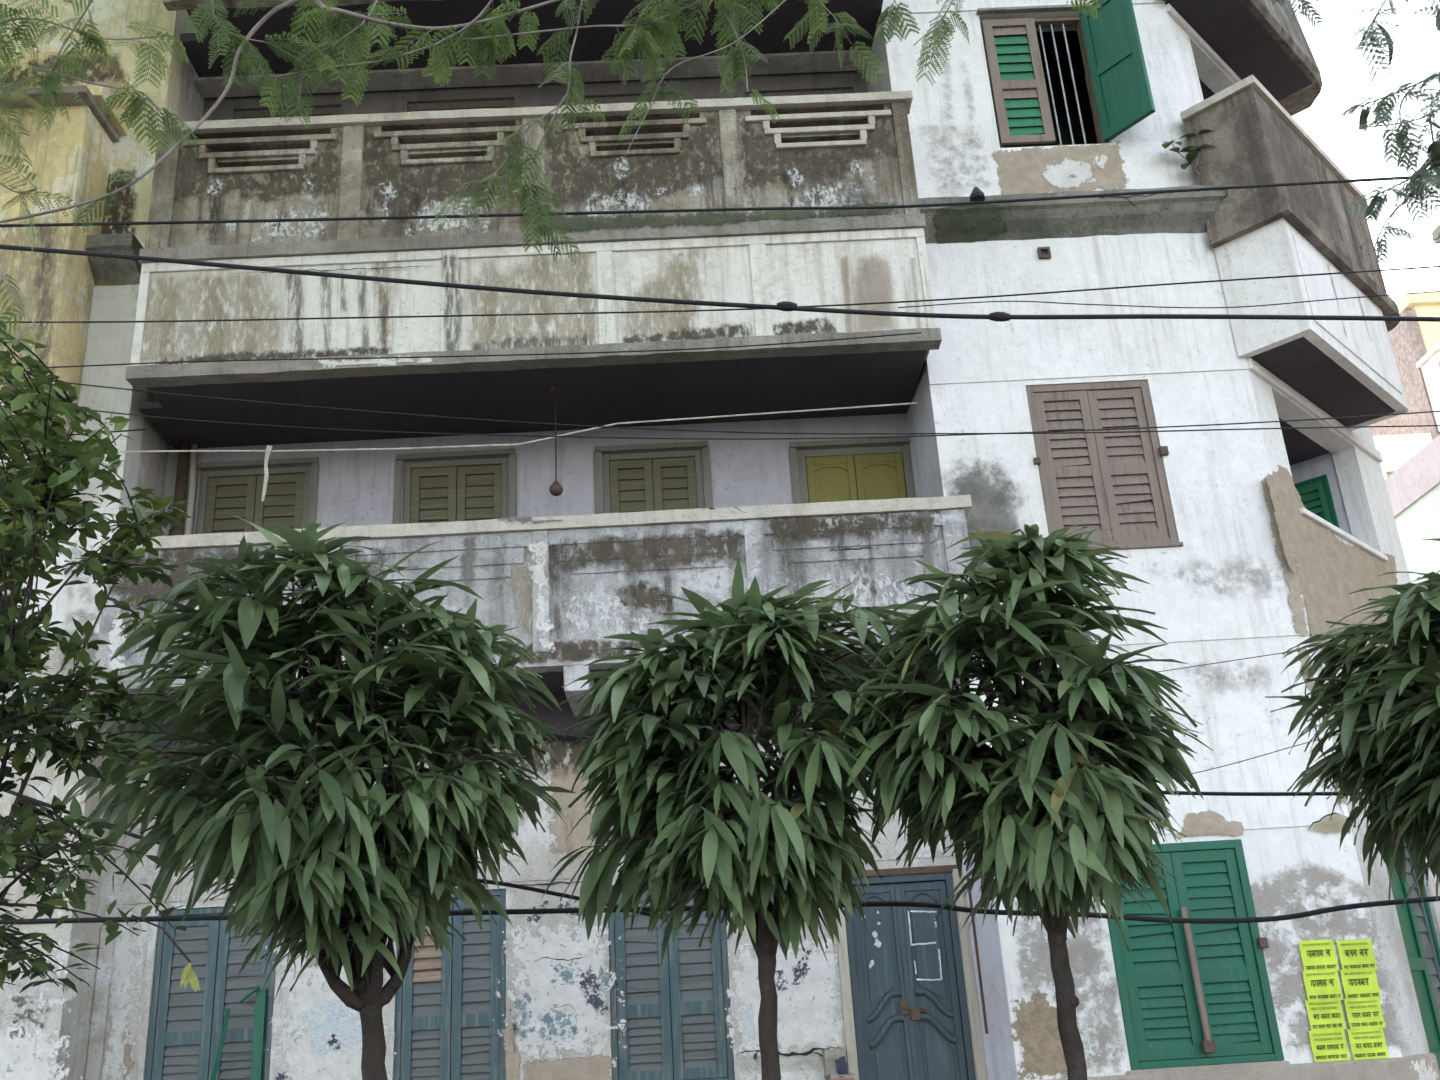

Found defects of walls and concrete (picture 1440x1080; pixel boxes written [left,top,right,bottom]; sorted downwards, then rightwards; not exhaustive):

leakage [531,171,899,234]
flaking render [992,141,1127,195]
leakage [143,262,388,364]
leakage [471,254,594,344]
leakage [500,529,742,664]
leakage [769,510,938,598]
leakage [951,463,1018,583]
peeling [1179,810,1243,838]
peeling [0,937,84,1080]
peeling [492,898,626,1080]
flaking render [1011,901,1068,1080]
flaking render [1066,905,1122,1068]